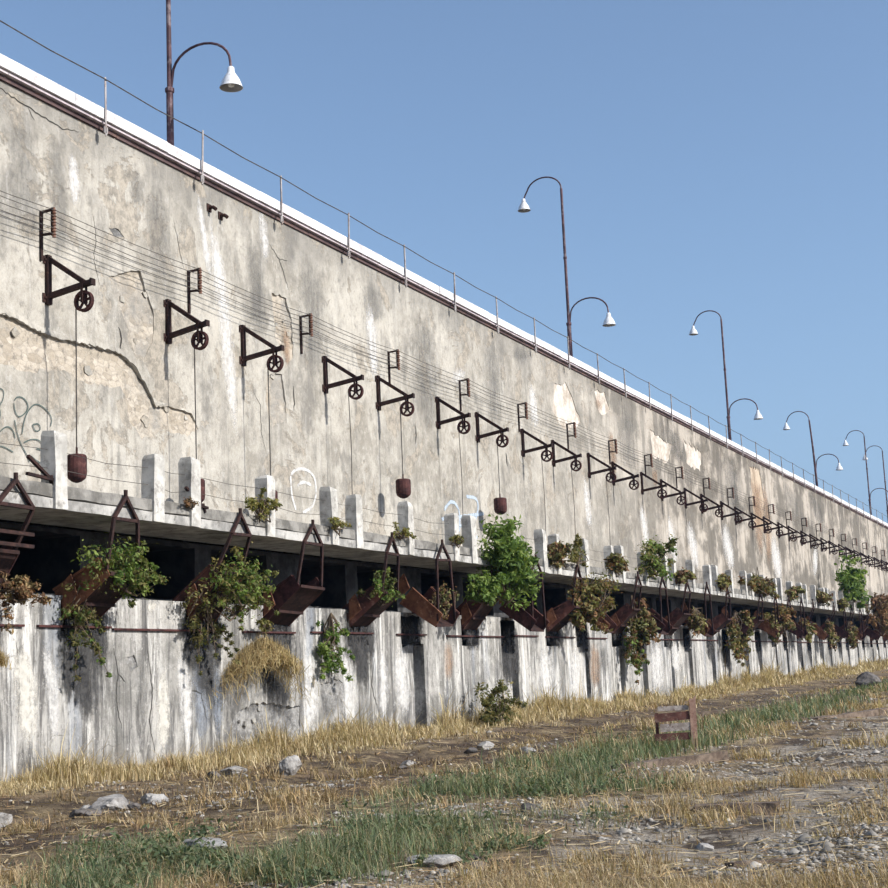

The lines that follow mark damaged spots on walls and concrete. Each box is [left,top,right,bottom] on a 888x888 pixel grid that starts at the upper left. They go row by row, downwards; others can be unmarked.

peeling [0,271,197,439]
peeling [553,383,581,431]
peeling [650,430,672,463]
peeling [684,441,701,470]
leakage [14,651,38,741]
leakage [44,615,107,732]
leakage [158,672,170,745]
leakage [178,615,222,732]
leakage [263,623,318,725]